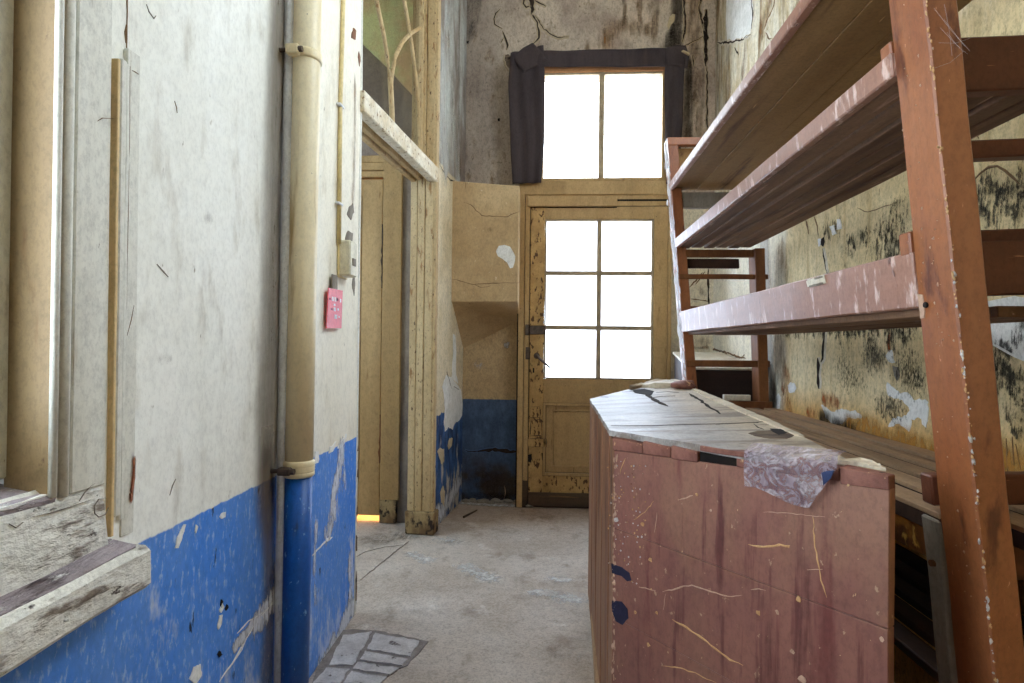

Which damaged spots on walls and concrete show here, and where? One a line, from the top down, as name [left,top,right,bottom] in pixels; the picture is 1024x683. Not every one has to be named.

crack [493,0,569,50]
crack [681,0,777,131]
peeling [496,245,515,268]
leakage [761,240,782,289]
peeling [437,334,463,464]
leakage [767,335,785,405]
peeling [821,405,862,423]
leakage [786,327,935,452]
leakage [993,322,1024,471]
crack [464,446,516,454]
peeling [175,524,198,548]
peeling [189,664,202,683]